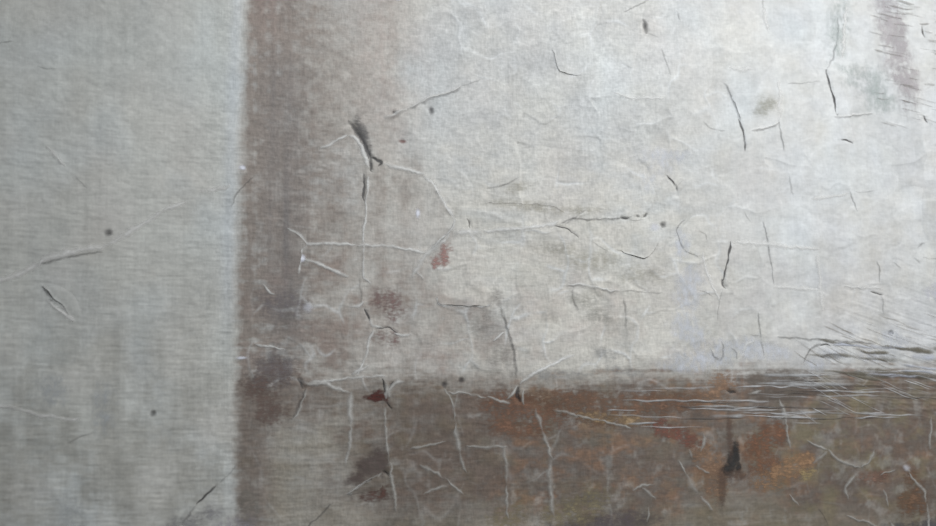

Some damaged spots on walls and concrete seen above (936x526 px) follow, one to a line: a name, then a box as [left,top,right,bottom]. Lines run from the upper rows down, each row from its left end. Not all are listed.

crack [827,75,861,117]
crack [703,242,732,298]
crack [295,124,571,511]
corrosion [367,390,388,402]
corrosion [530,374,736,446]
crack [780,402,930,526]